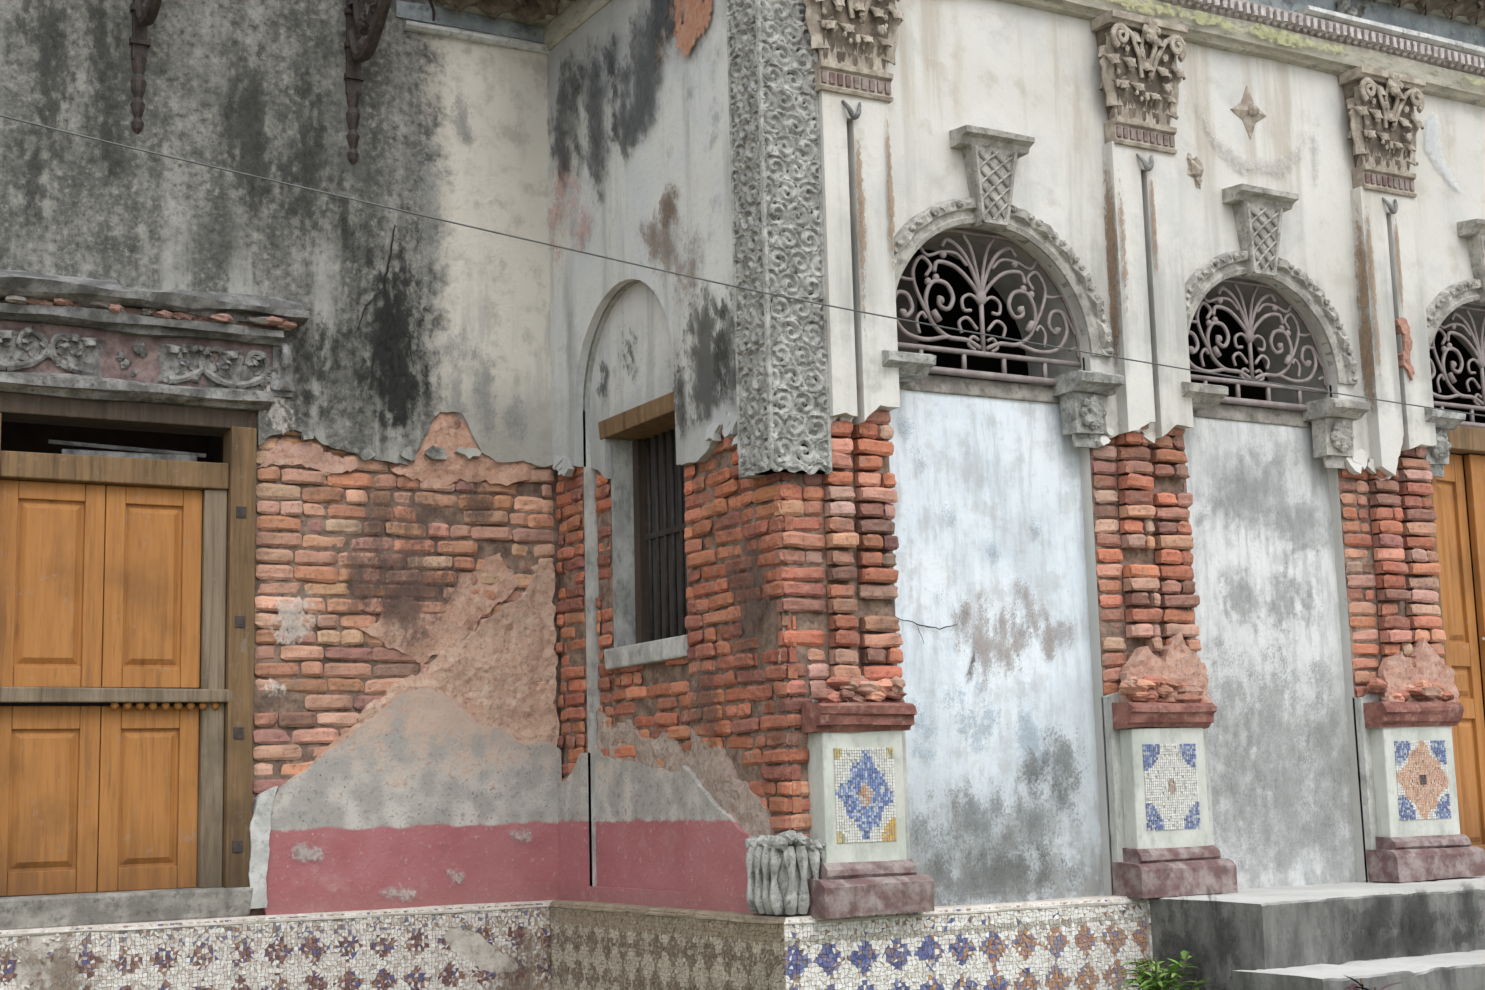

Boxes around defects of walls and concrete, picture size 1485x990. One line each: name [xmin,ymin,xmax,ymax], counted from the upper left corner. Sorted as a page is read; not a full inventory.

leakage [16,0,123,229]
leakage [224,48,439,441]
leakage [548,0,675,261]
peeling [656,0,712,65]
corrosion [1355,214,1381,410]
corrosion [1395,219,1403,309]
spalling [252,410,907,837]
spalling [1091,420,1213,703]
spalling [1338,447,1459,702]
peeling [296,845,322,859]
leakage [916,728,1082,906]